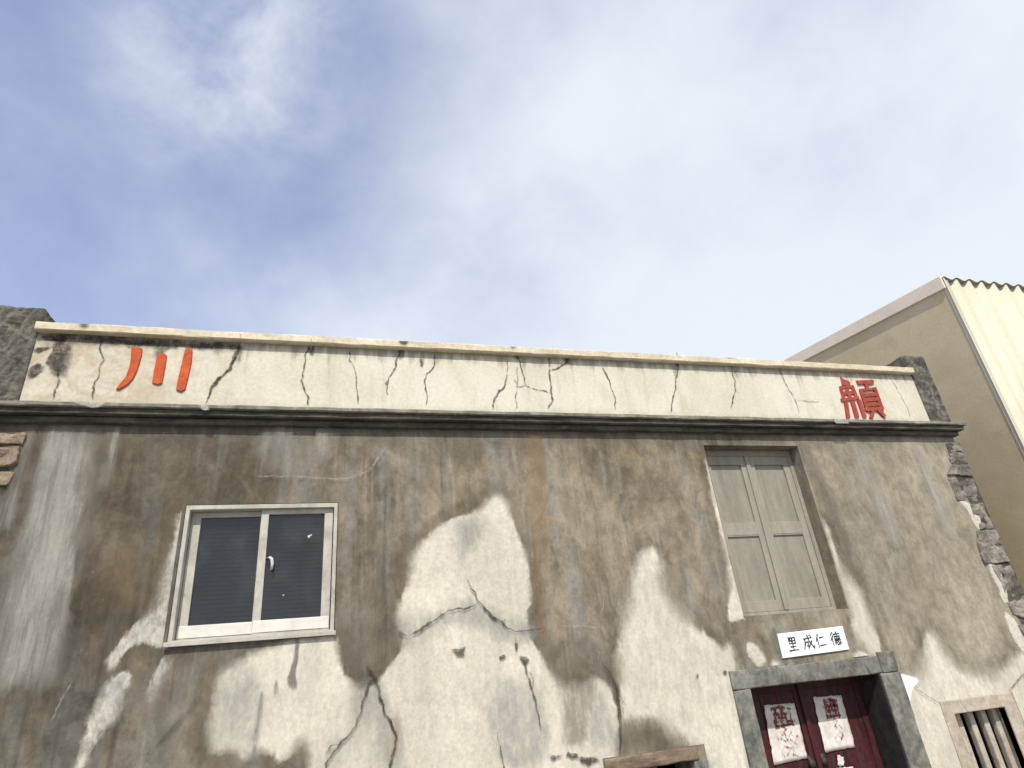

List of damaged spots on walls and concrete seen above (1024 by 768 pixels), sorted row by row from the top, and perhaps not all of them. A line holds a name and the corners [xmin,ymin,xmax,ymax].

damp [28,324,243,378]
crack [206,343,241,403]
crack [301,346,314,404]
crack [493,356,568,408]
damp [5,430,88,681]
damp [275,639,299,688]
crack [399,580,541,728]
crack [325,665,397,768]